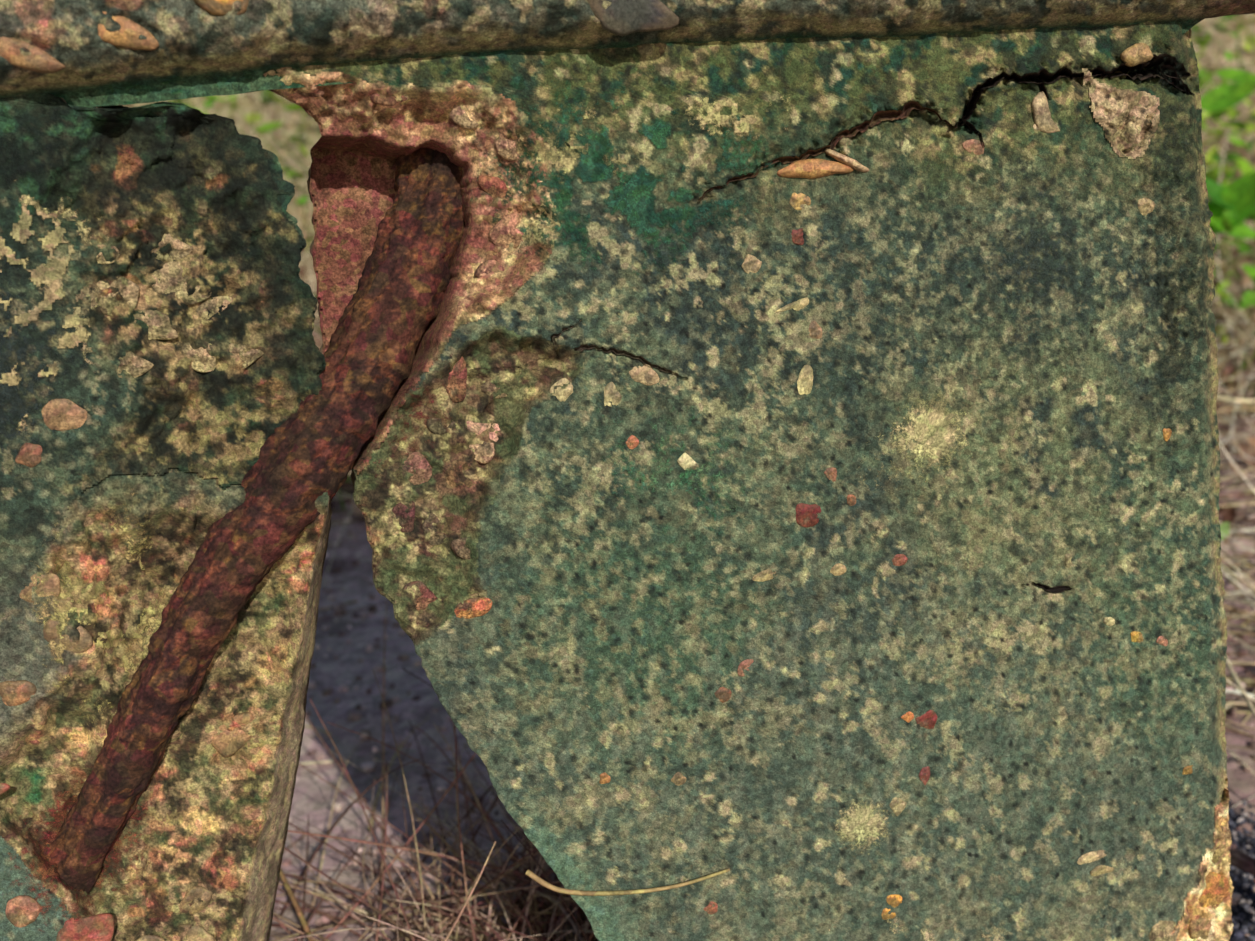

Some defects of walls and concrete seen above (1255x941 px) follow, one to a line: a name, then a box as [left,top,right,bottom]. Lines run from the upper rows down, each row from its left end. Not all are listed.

crack [698,53,1194,201]
spalling [0,67,585,941]
corrosion [9,773,157,922]